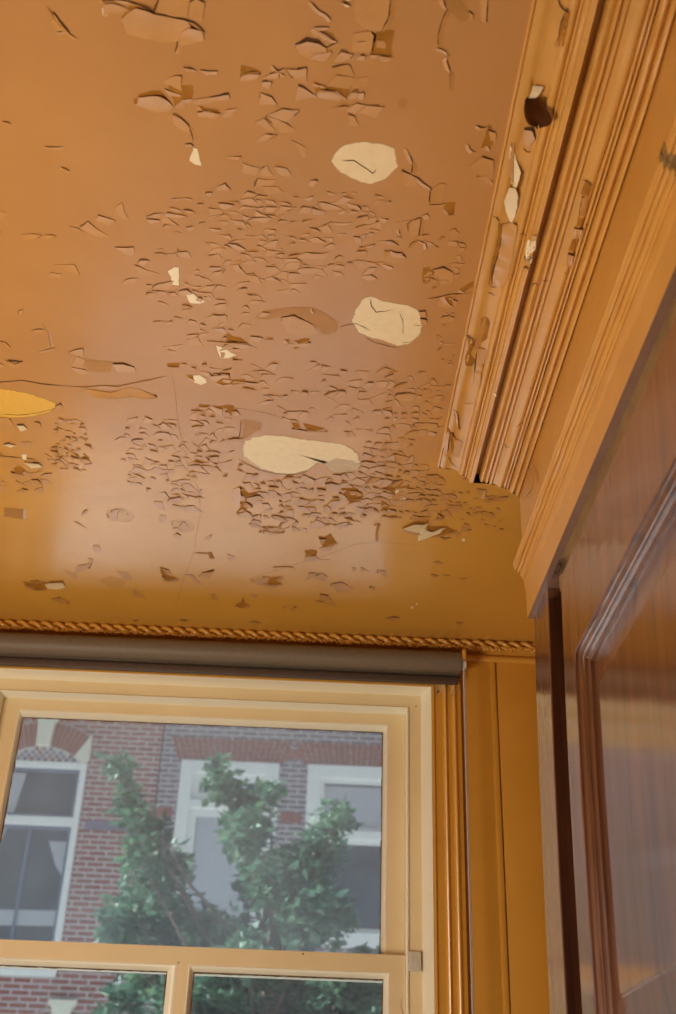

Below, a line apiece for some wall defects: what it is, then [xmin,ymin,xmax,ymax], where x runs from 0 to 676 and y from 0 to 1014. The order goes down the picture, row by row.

peeling [47,7,77,41]
peeling [99,0,206,54]
peeling [435,0,488,91]
peeling [555,0,570,47]
peeling [240,0,396,157]
peeling [133,66,237,166]
peeling [464,124,496,185]
peeling [488,79,552,295]
peeling [68,348,136,375]
peeling [0,402,92,493]
peeling [4,507,26,520]
peeling [22,545,101,605]